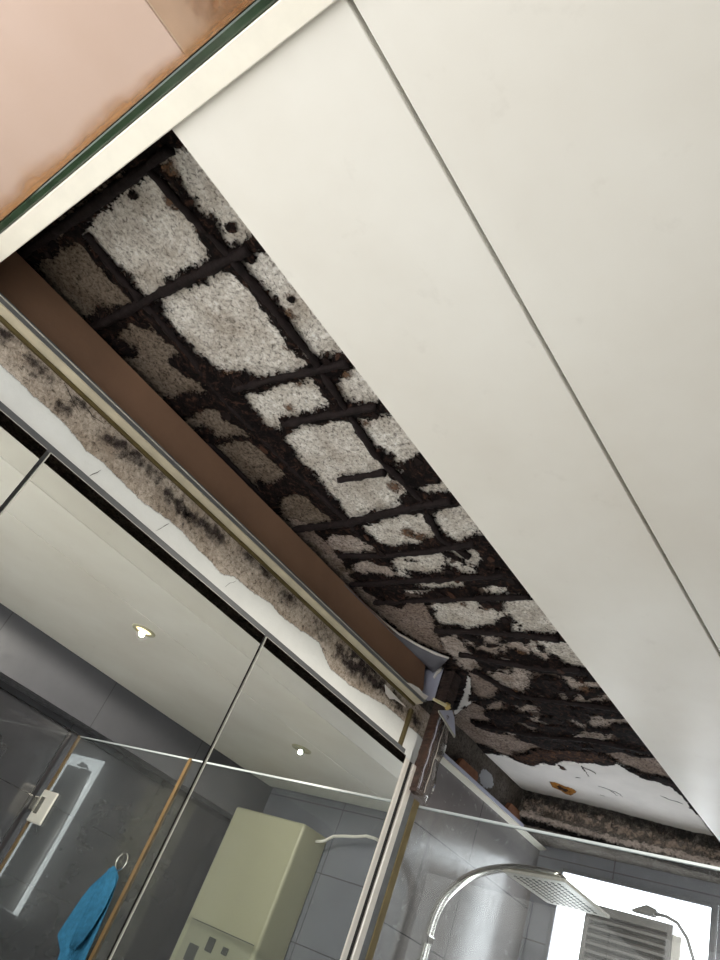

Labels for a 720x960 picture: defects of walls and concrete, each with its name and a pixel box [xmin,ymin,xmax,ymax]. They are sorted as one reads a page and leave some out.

damp [26,354,52,380]
damp [55,397,86,416]
damp [101,434,224,543]
corrosion [16,129,699,815]
spalling [0,144,720,867]
damp [244,552,275,581]
damp [520,818,720,878]
damp [523,790,720,851]